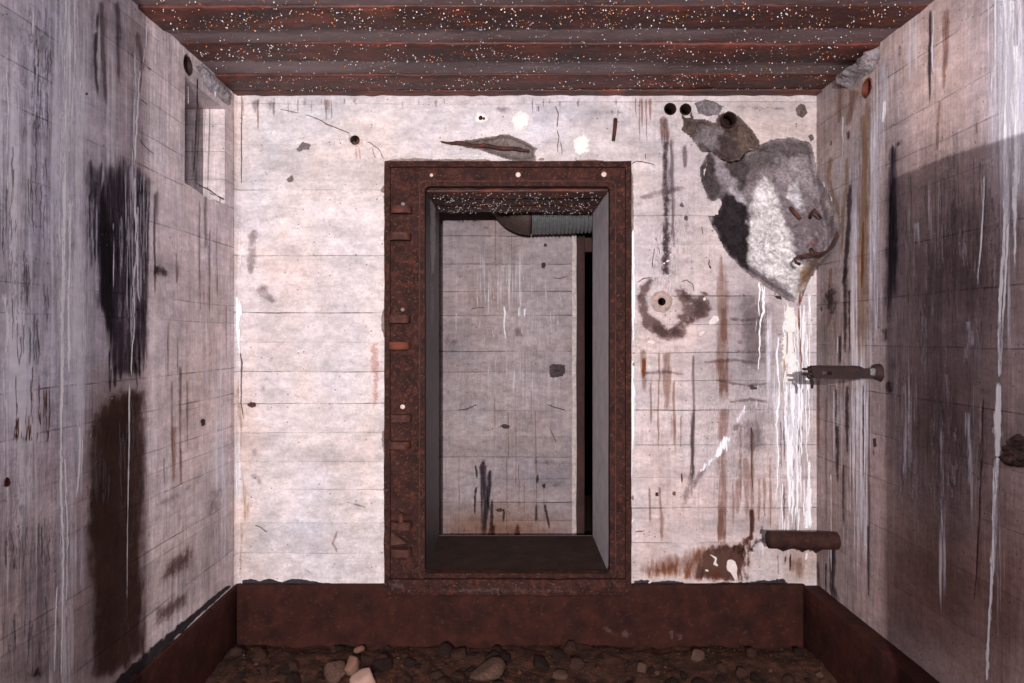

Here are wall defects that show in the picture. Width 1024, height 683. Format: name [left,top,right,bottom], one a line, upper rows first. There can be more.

spalling [836,46,880,90]
spalling [440,134,544,161]
water stain [662,197,670,274]
spalling [682,99,841,305]
water stain [2,0,167,678]
water stain [637,277,709,338]
water stain [756,282,765,369]
water stain [870,0,1023,681]
water stain [775,294,812,531]
rust [663,510,754,581]